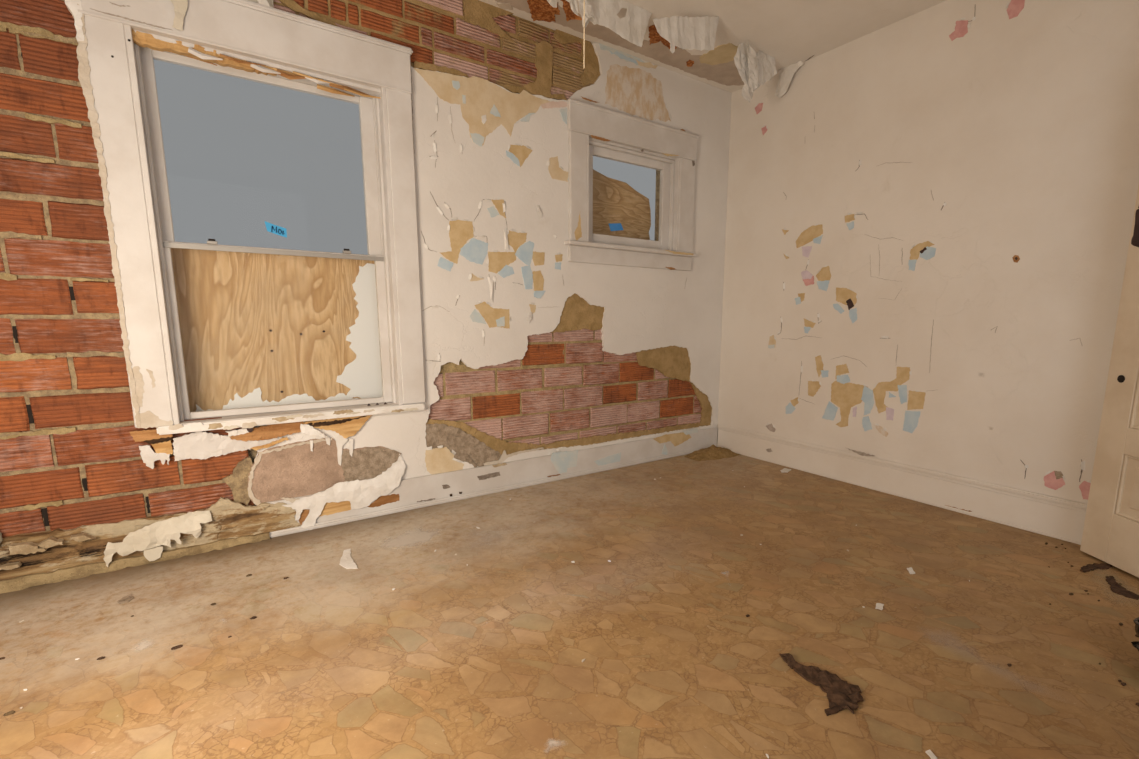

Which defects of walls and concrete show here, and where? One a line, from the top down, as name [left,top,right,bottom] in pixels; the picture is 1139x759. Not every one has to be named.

flaking render [0,0,712,569]
peeling [782,224,858,323]
peeling [908,240,936,271]
peeling [786,355,926,437]